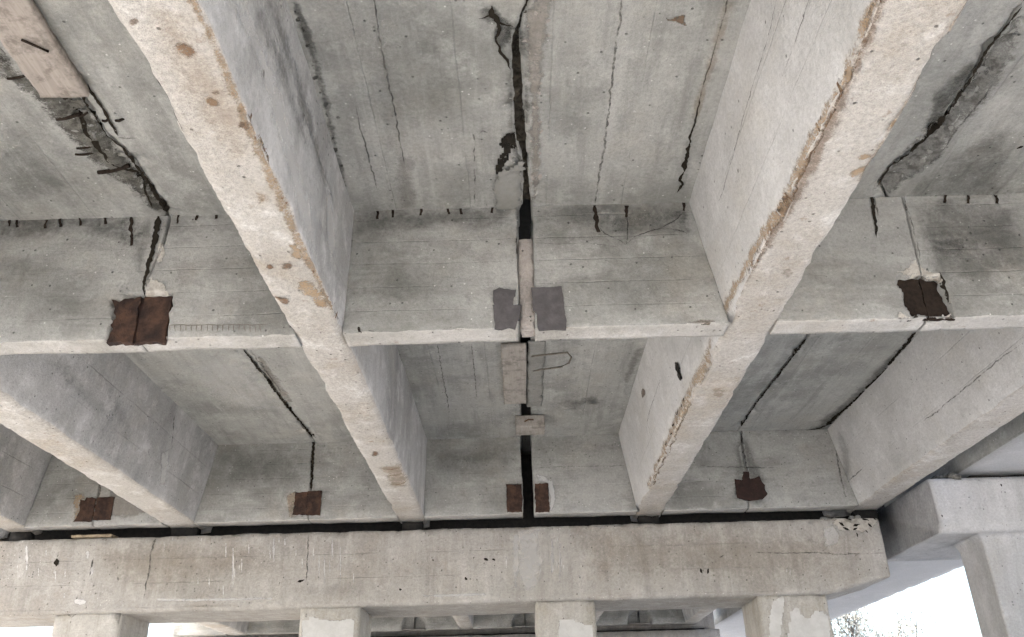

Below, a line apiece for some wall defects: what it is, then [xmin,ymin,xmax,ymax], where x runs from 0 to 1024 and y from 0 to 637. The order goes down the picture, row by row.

spalling [0,48,163,210]
crack [63,85,170,297]
crack [479,6,513,68]
crack [595,9,622,202]
crack [601,44,716,244]
spalling [879,17,1018,193]
crack [243,349,315,489]
crack [741,339,806,472]
crack [810,315,918,430]
spalling [833,518,878,537]